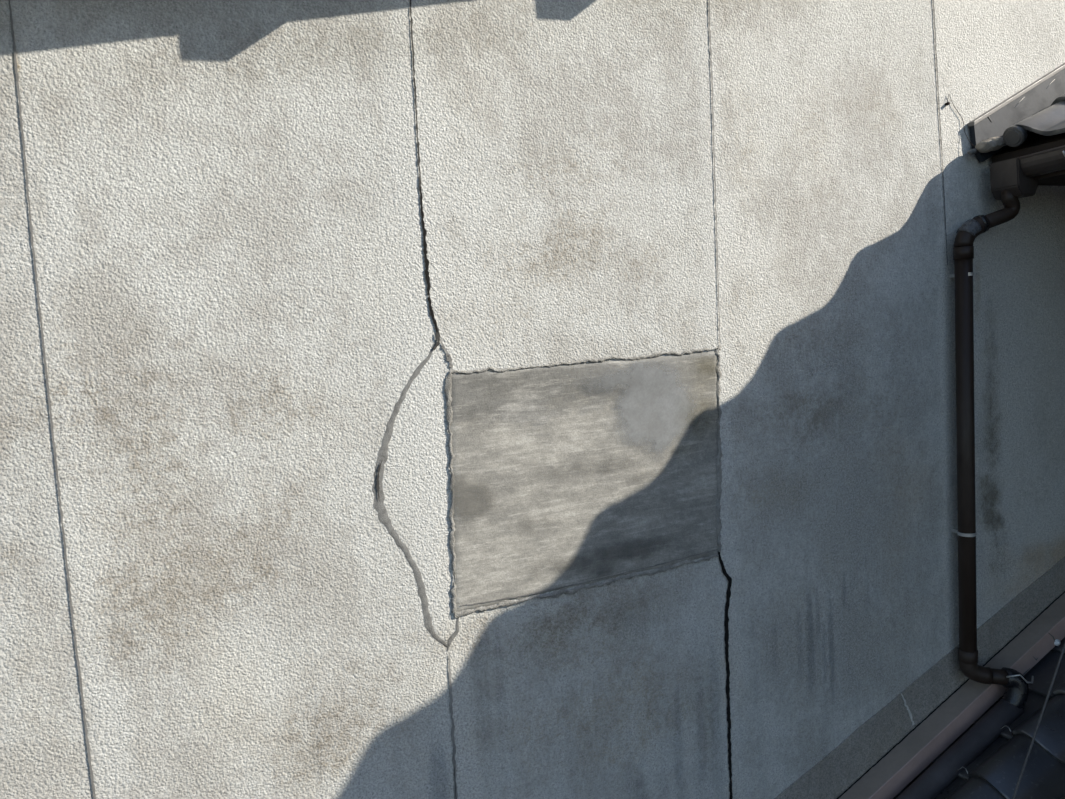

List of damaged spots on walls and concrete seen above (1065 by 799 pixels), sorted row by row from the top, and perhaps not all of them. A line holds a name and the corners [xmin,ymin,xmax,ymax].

crack [372,0,459,799]
crack [718,552,733,799]